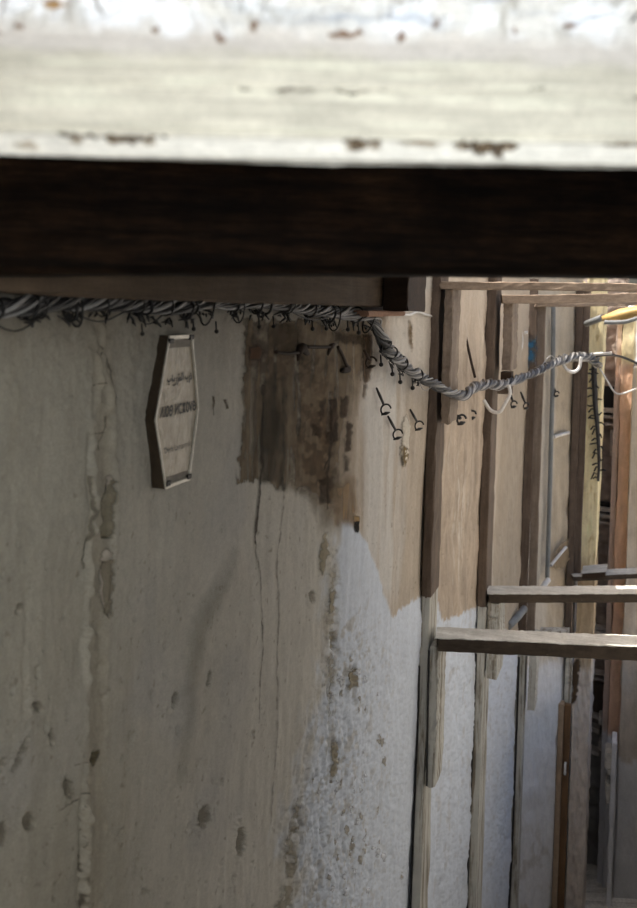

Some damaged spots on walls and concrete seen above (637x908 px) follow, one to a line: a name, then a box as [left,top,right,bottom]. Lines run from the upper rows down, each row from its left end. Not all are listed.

spalling [4,0,32,12]
peeling [58,132,167,145]
peeling [454,140,520,159]
water stain [335,332,373,396]
crack [255,385,265,563]
spalling [98,475,118,617]